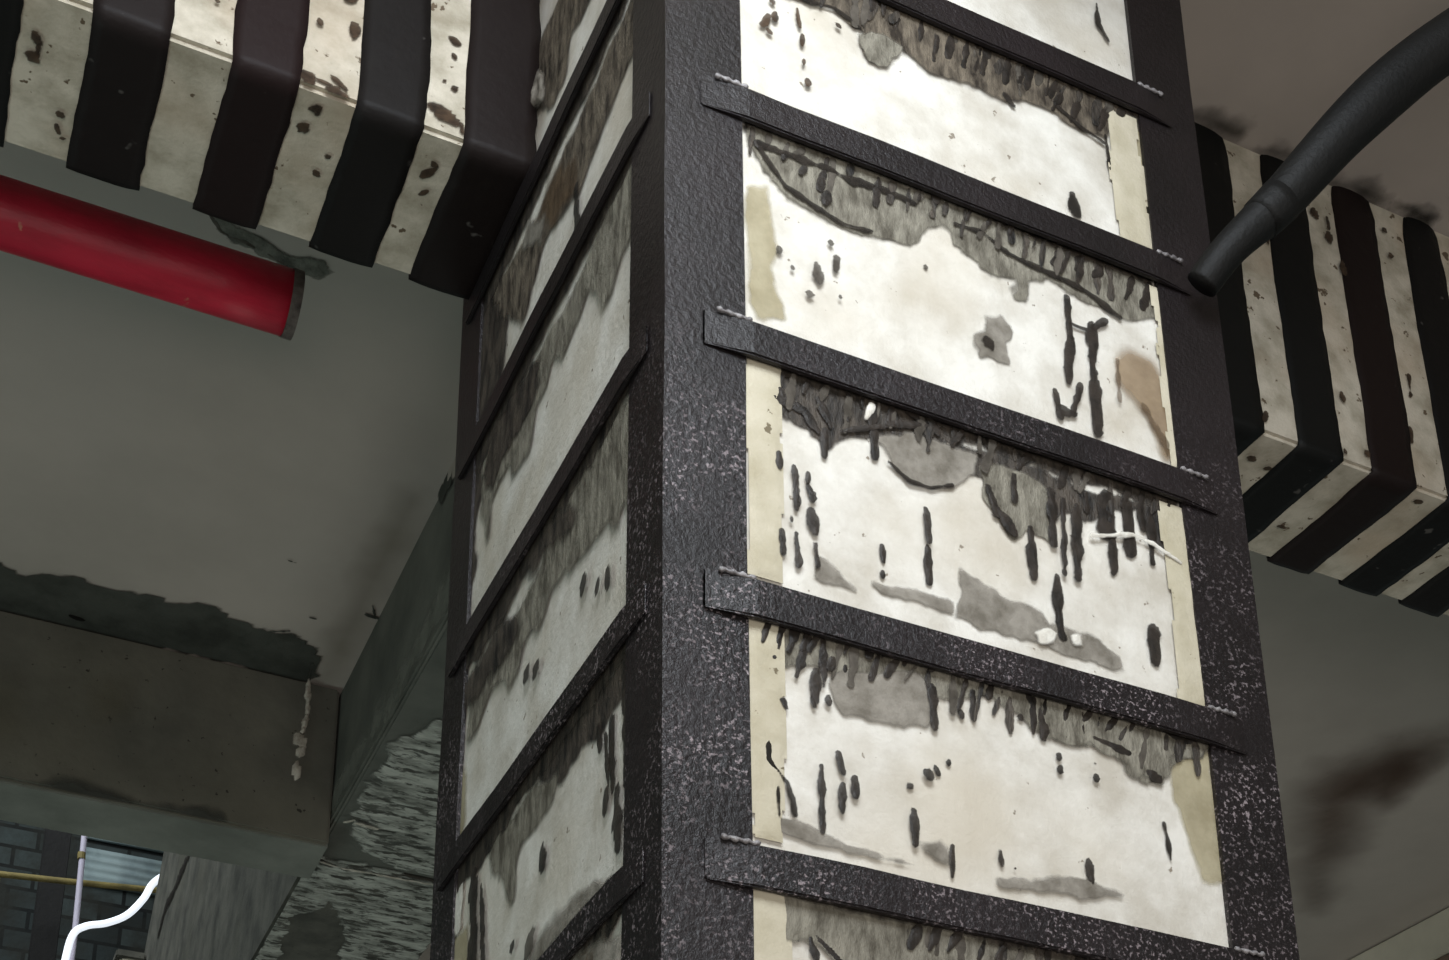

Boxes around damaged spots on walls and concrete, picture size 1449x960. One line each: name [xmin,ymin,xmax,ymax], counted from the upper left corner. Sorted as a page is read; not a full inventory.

peeling [759,0,779,35]
peeling [796,0,1139,144]
peeling [743,122,1155,321]
peeling [773,368,1182,582]
peeling [0,563,321,682]
peeling [464,382,629,742]
peeling [761,622,1208,785]
peeling [774,893,1094,960]